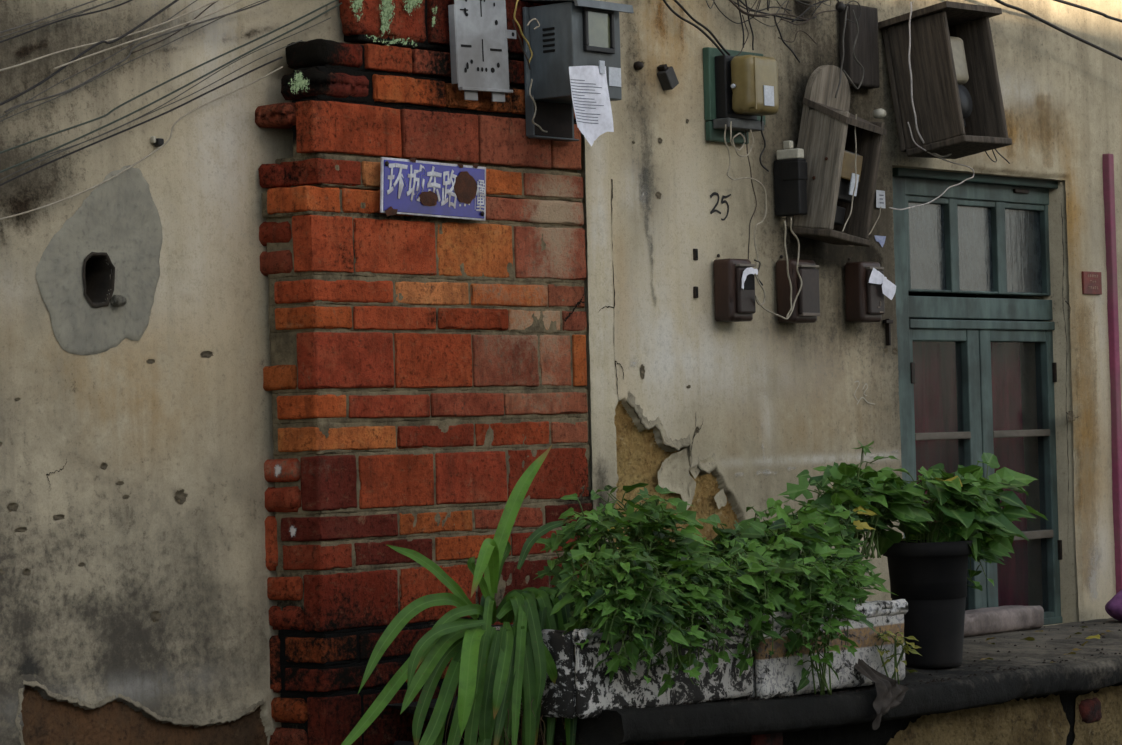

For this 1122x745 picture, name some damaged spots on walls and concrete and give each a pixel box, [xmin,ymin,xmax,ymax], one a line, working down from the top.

damp [0,192,51,238]
peeling [613,391,740,549]
peeling [15,680,268,745]